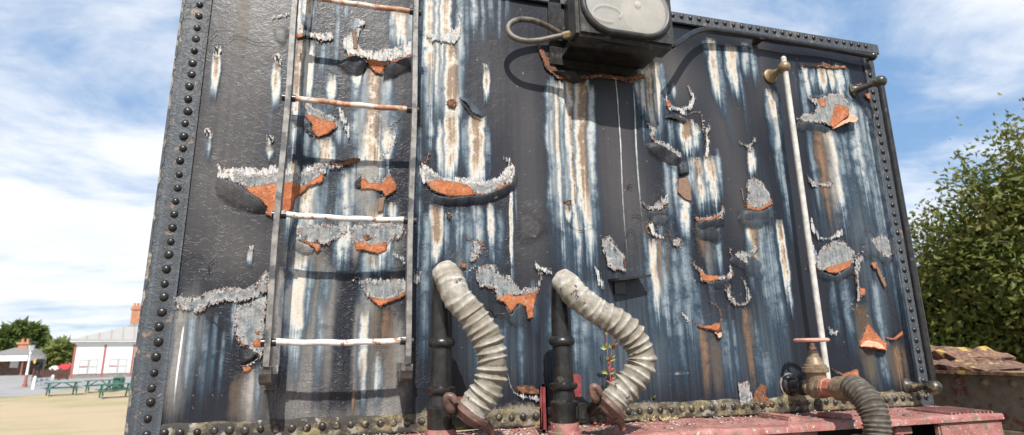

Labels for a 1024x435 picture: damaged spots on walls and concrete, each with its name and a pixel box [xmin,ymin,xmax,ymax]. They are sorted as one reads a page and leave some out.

peeling [296,18,412,81]
leakage [703,40,758,121]
peeling [174,271,269,373]
peeling [204,128,423,308]
leakage [273,0,402,409]
leakage [389,0,517,349]
peeling [418,152,518,220]
peeling [459,235,552,326]
leakage [745,89,794,333]
leakage [799,65,905,320]
peeling [811,217,903,352]
leakage [871,283,890,383]